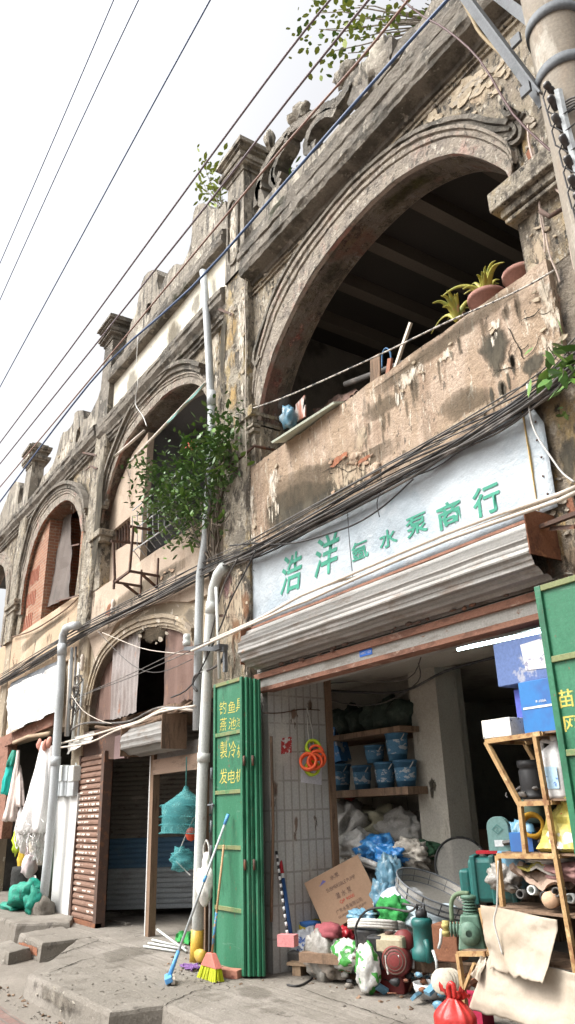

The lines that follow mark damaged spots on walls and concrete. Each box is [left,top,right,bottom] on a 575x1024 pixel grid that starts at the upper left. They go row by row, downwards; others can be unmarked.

flaking render [427,59,511,122]
flaking render [212,286,265,427]
peeling [395,361,425,405]
water stain [267,298,543,549]
peeling [267,463,281,522]
peeling [328,427,373,494]